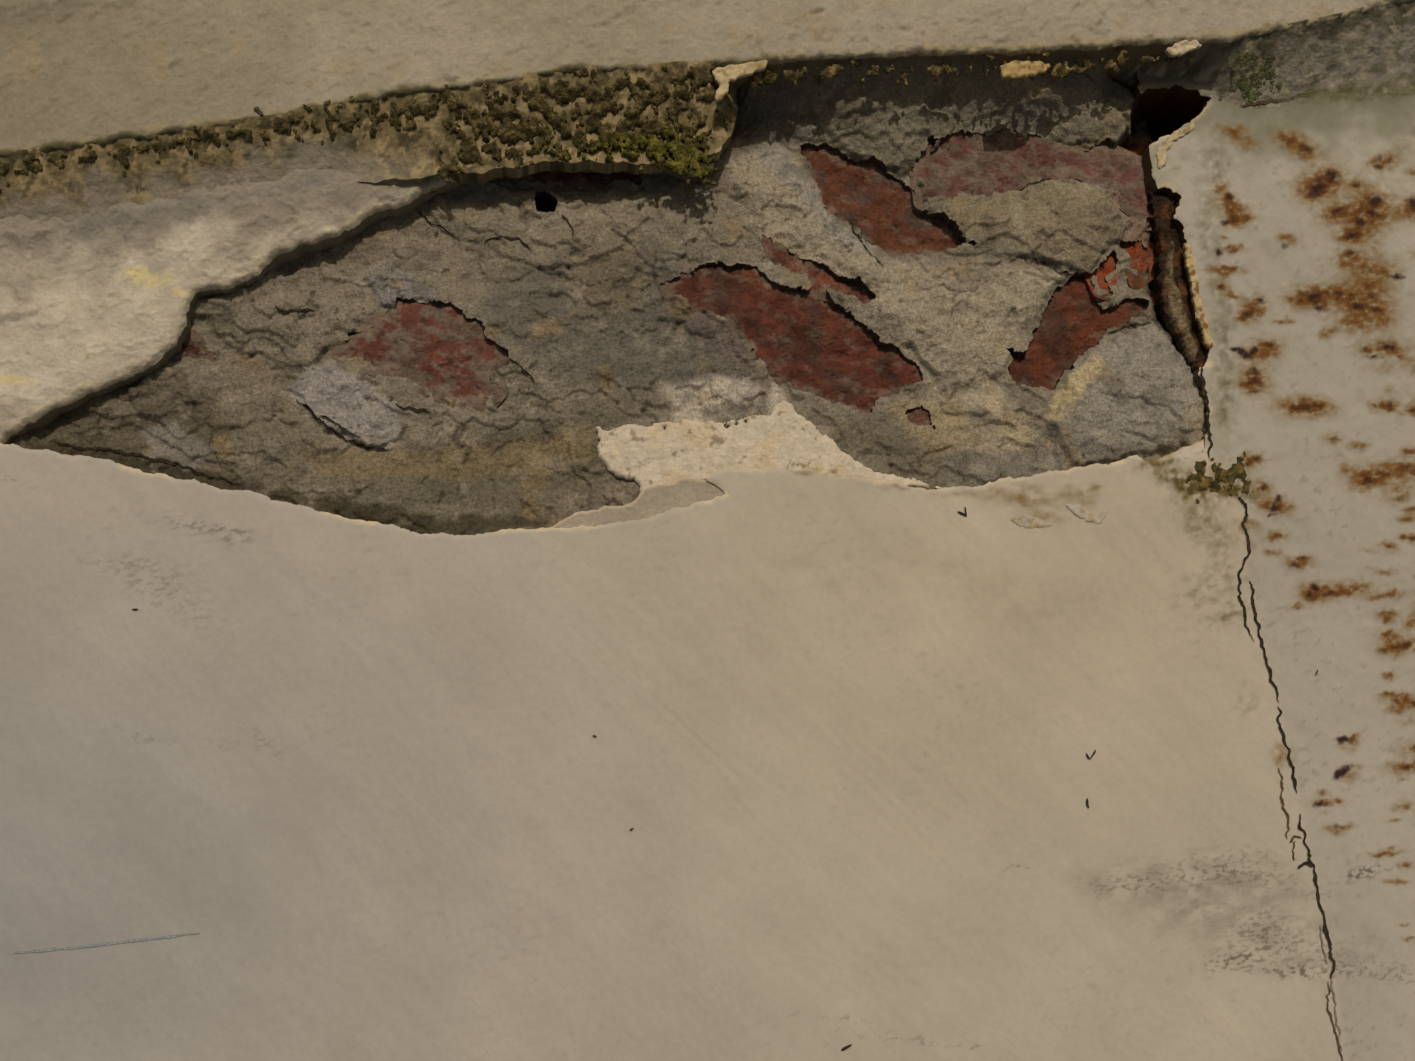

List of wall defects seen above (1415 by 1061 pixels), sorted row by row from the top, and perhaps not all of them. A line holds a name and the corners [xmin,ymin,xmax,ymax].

corrosion [1211,132,1415,359]
spalling [8,56,1206,536]
spalling [1183,243,1214,350]
crack [1200,363,1213,459]
corrosion [1231,340,1280,393]
corrosion [1279,397,1334,416]
corrosion [1245,455,1293,516]
corrosion [1342,449,1415,548]
corrosion [1293,571,1415,656]
corrosion [1382,672,1415,713]
crack [1237,496,1343,1061]
corrosion [1335,765,1352,779]